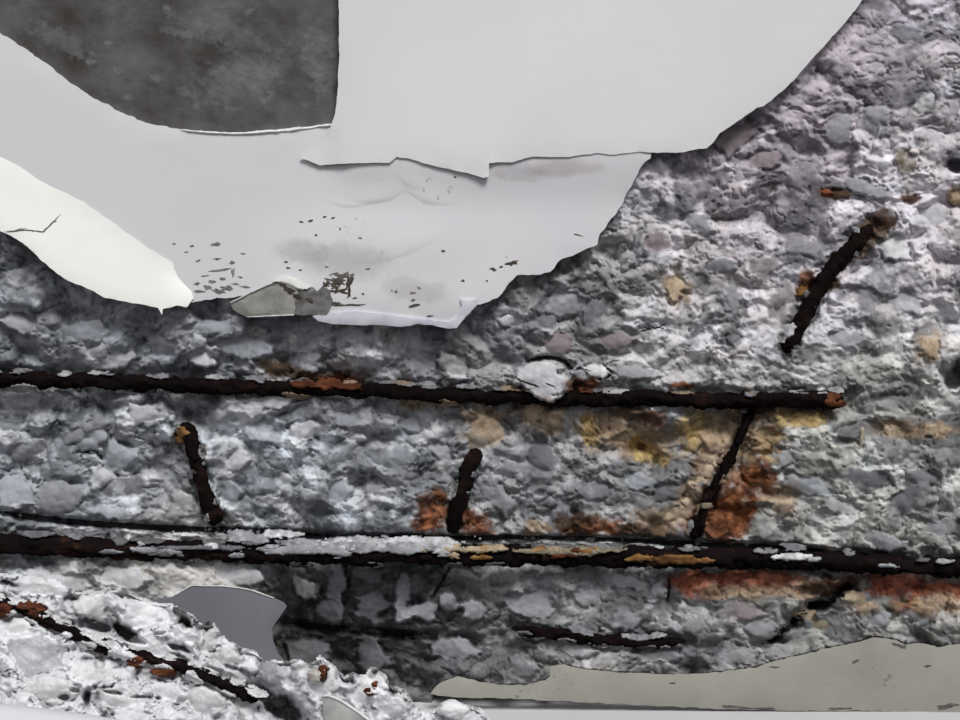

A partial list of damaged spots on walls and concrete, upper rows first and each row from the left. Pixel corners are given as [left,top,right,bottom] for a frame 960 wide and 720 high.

crack [5,214,61,232]
spalling [0,0,960,558]
rust [796,271,814,298]
rust [264,362,368,382]
rust [564,377,599,392]
rust [671,381,695,389]
rust [525,406,836,548]
rust [411,487,449,535]
rust [460,508,494,536]
spalling [0,512,960,704]
rust [668,568,852,599]
rust [851,573,960,615]